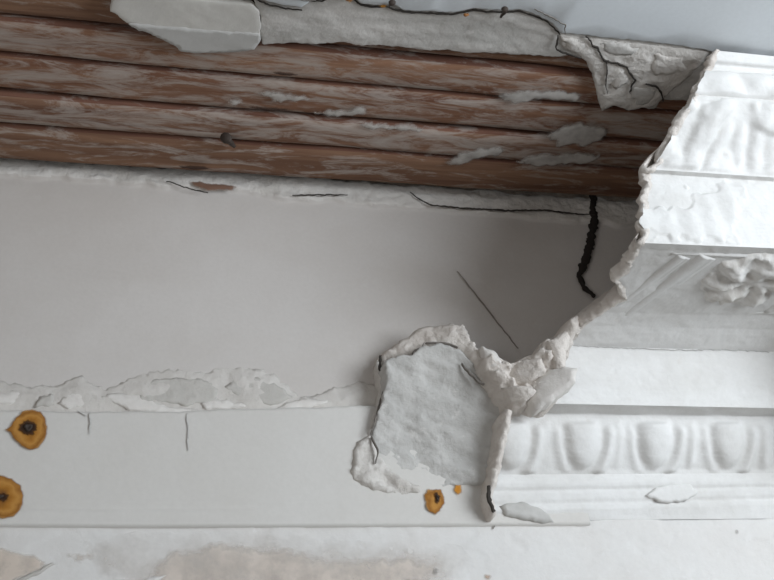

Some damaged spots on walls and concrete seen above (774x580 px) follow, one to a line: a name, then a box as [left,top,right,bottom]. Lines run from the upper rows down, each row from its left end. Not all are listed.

peeling [110,0,261,53]
crack [257,0,325,11]
crack [354,0,664,101]
crack [166,181,208,193]
crack [293,191,345,199]
crack [410,192,599,298]
flaking render [0,35,720,524]
crack [457,271,518,348]
corrosion [6,410,47,449]
corrosion [0,475,23,519]
corrosion [424,489,444,514]